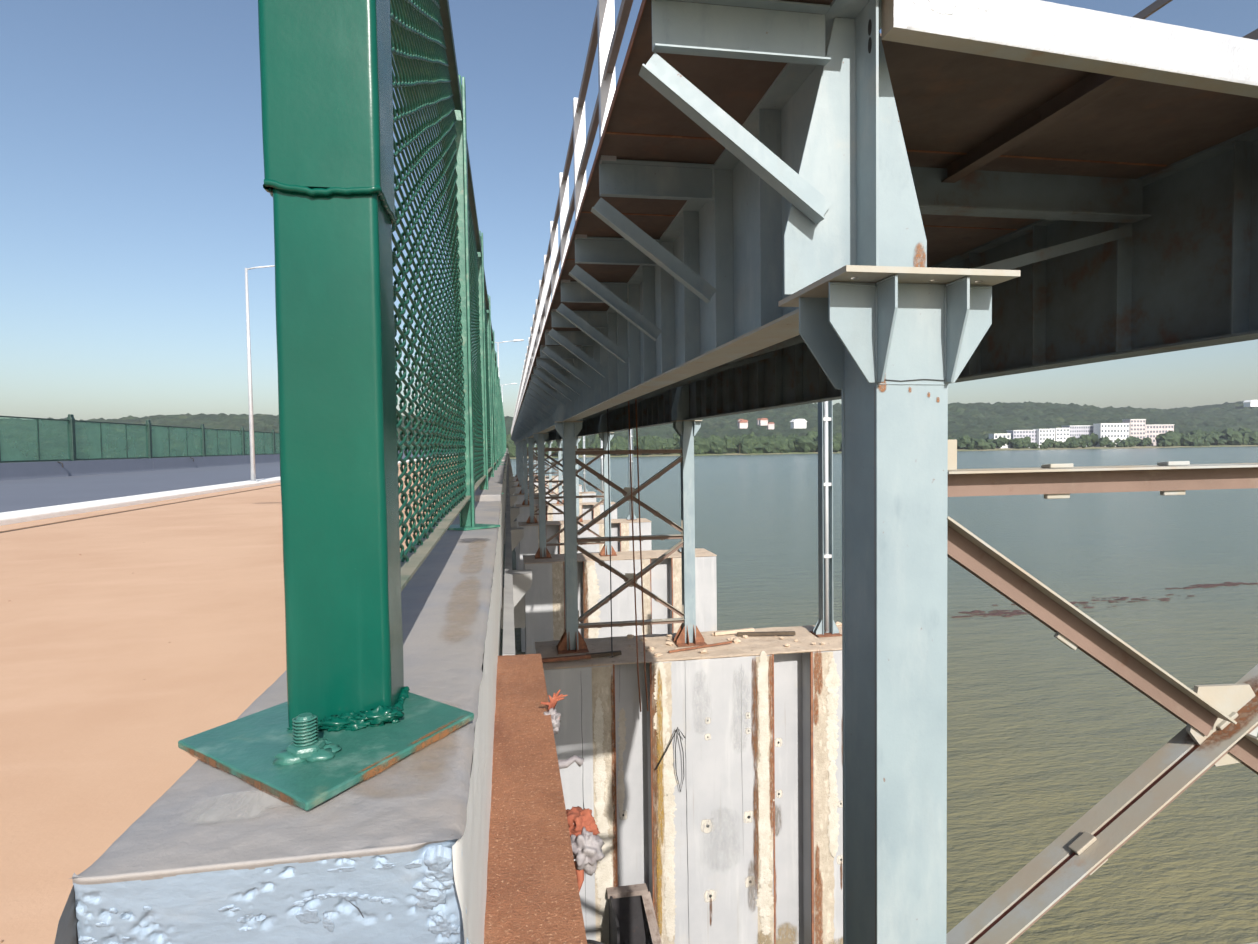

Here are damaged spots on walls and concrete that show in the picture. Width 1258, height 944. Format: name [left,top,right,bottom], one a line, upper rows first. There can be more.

corrosion [914,244,926,267]
corrosion [814,652,823,724]
corrosion [752,657,773,892]
corrosion [1093,682,1258,837]
spalling [78,906,152,944]
spalling [372,845,461,938]
corrosion [815,845,823,944]
corrosion [969,852,1076,944]